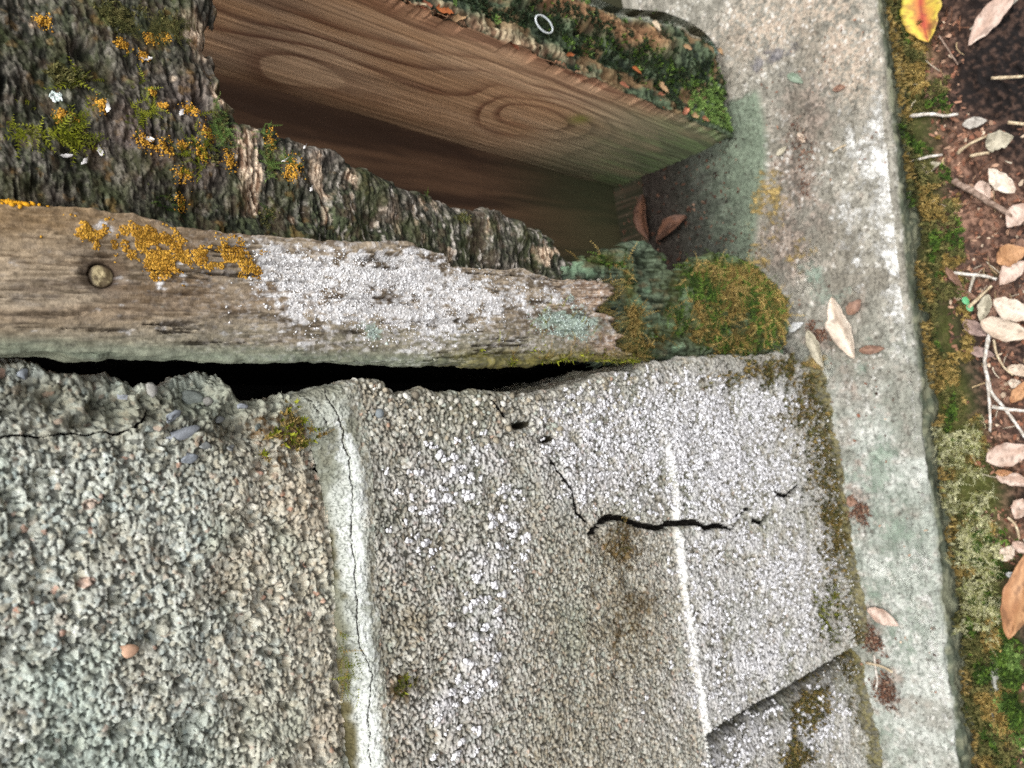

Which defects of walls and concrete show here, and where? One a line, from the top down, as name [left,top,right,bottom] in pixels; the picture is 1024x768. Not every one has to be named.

crack [0,410,147,438]
crack [549,459,812,536]
crack [308,390,373,765]